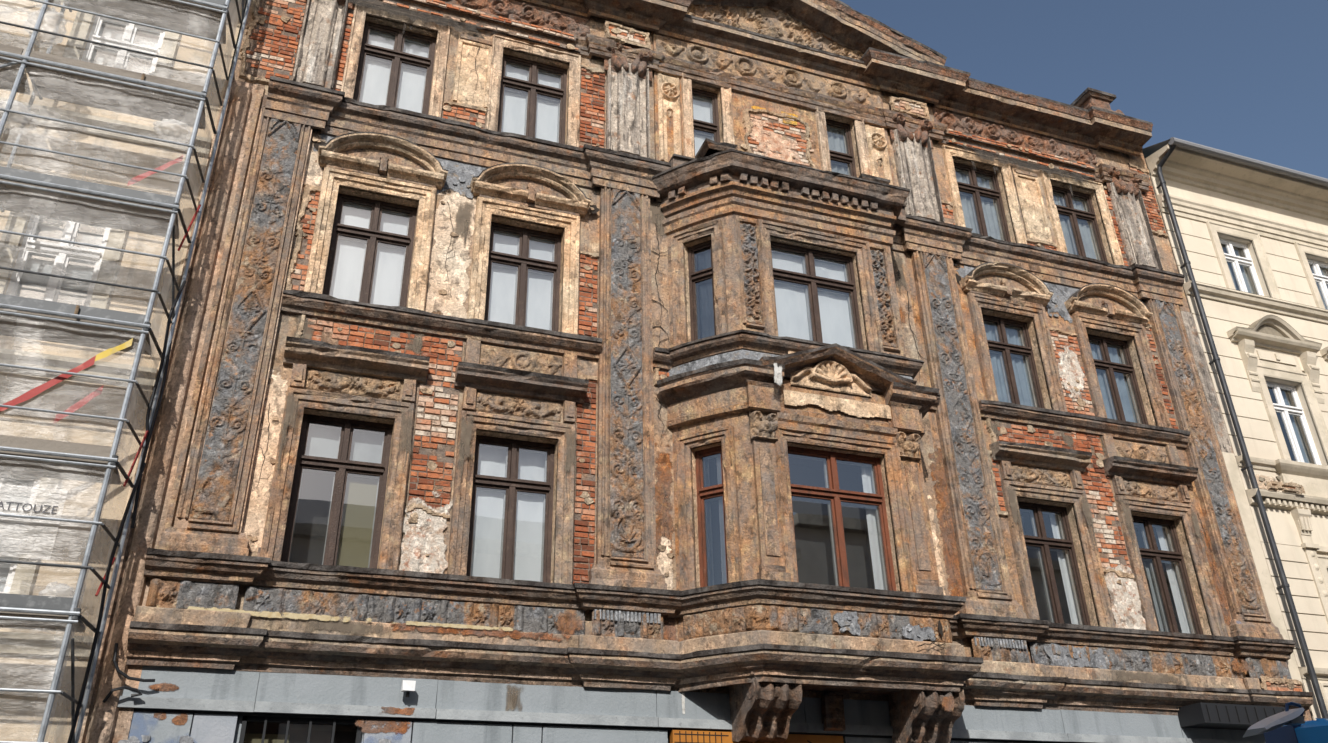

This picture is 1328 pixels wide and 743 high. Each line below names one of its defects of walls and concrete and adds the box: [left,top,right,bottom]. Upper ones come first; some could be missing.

flaking render [238,0,307,85]
flaking render [334,6,355,91]
flaking render [383,0,606,148]
flaking render [741,108,816,169]
flaking render [284,134,334,291]
flaking render [578,251,599,338]
peeling [954,262,975,284]
flaking render [1044,282,1095,416]
flaking render [295,314,463,574]
flaking render [984,418,1158,631]